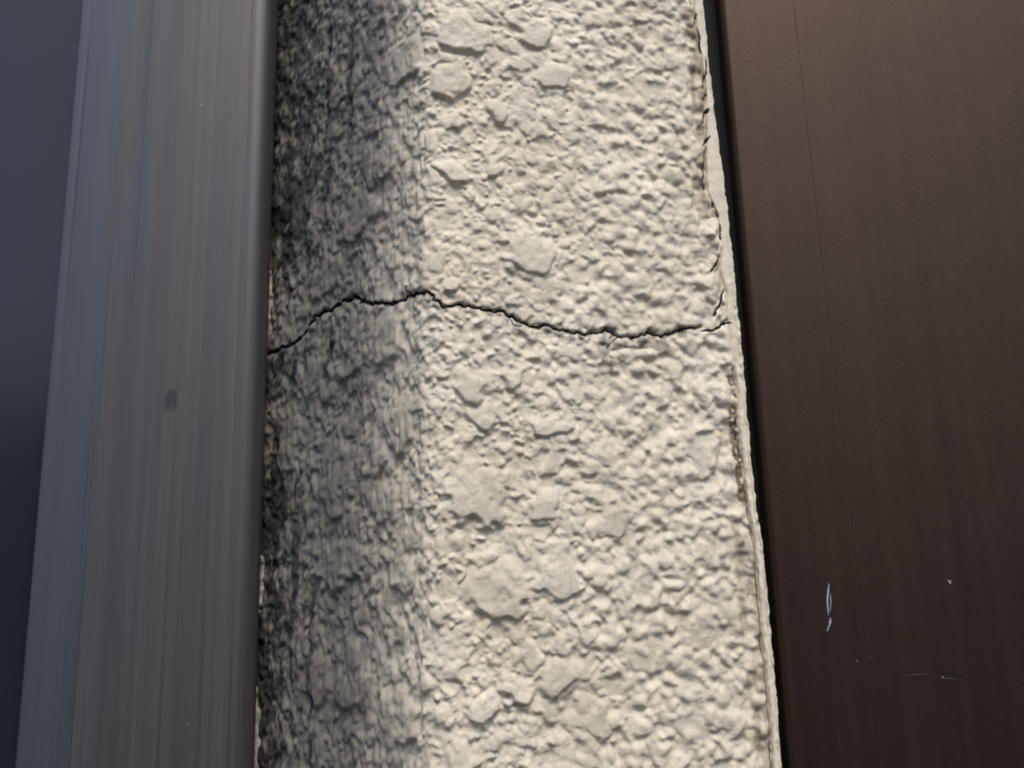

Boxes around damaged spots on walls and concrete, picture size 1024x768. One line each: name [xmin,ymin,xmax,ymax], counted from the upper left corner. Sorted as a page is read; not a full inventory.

crack [267,2,732,356]